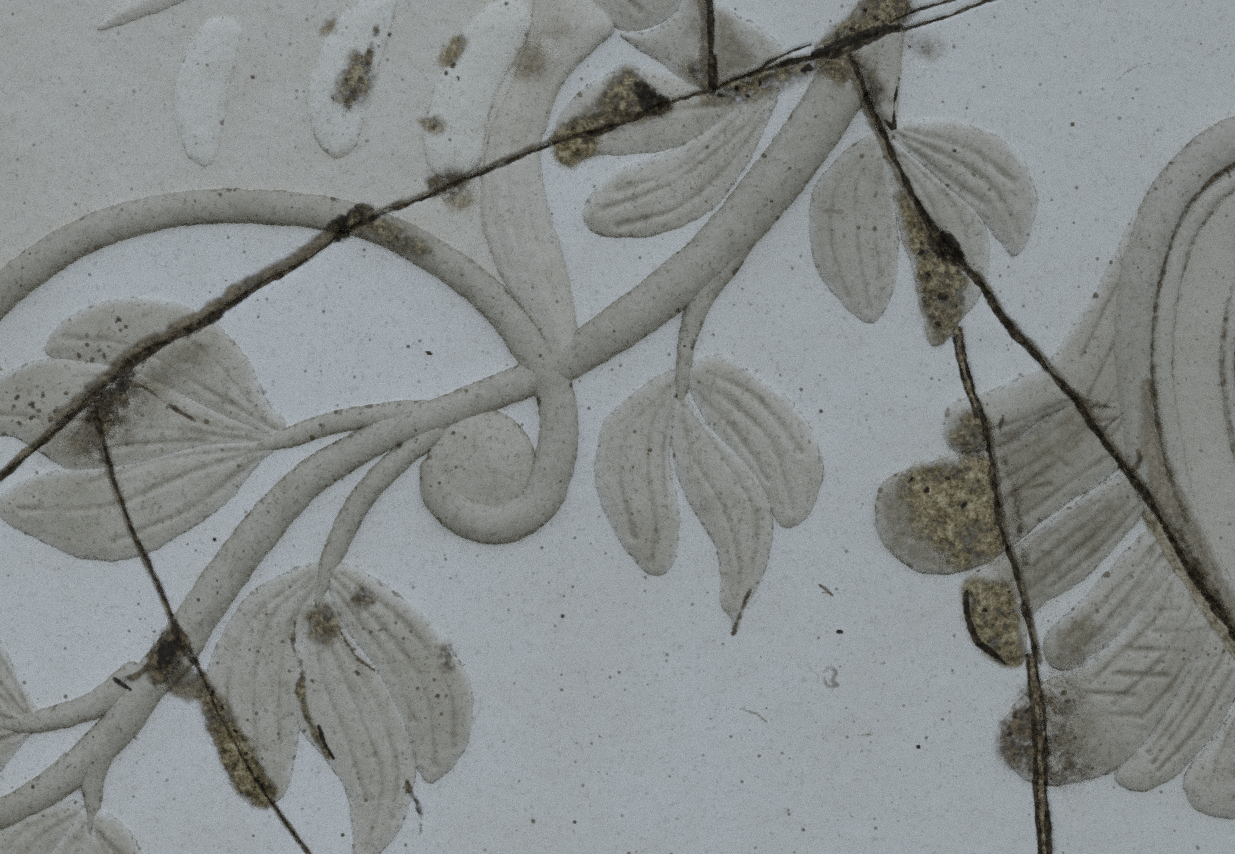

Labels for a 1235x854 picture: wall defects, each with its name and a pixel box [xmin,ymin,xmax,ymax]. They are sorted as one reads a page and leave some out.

damp [174,619,200,666]
crack [89,408,311,854]
crack [0,0,1235,659]
crack [952,325,1052,854]